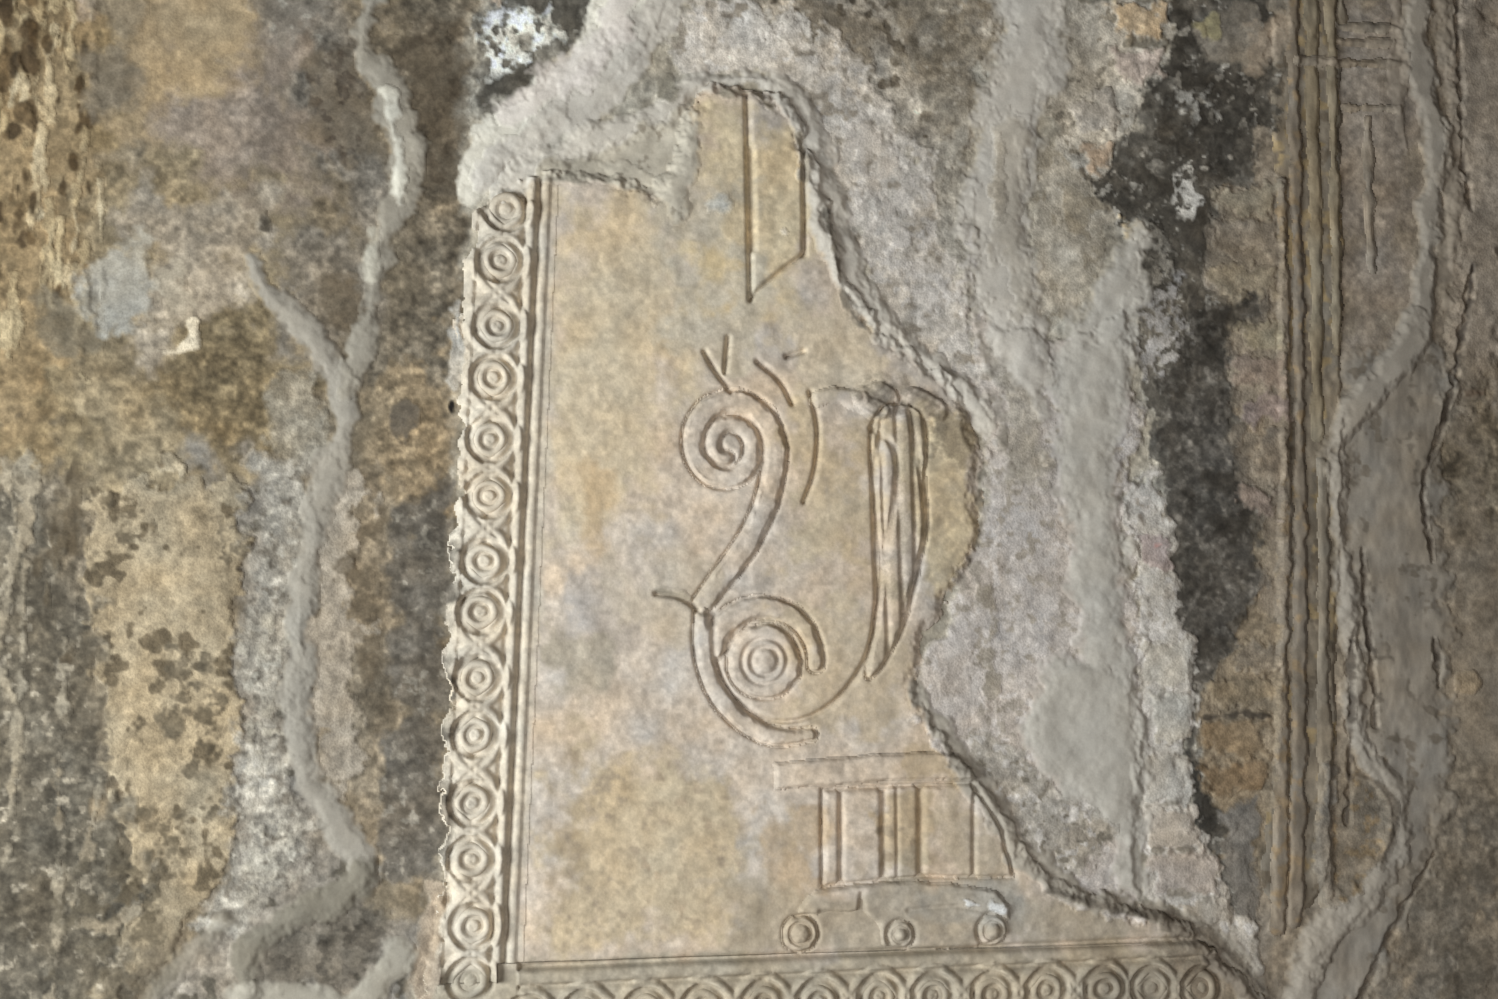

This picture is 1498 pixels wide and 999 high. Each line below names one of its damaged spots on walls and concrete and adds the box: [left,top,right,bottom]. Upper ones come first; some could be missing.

crack [138,0,433,999]
spalling [654,72,682,106]
spalling [756,0,998,164]
spalling [904,169,1299,974]
flaking render [1029,0,1179,343]
damp [1090,0,1295,692]
crack [904,0,1487,999]
damp [1184,728,1228,884]